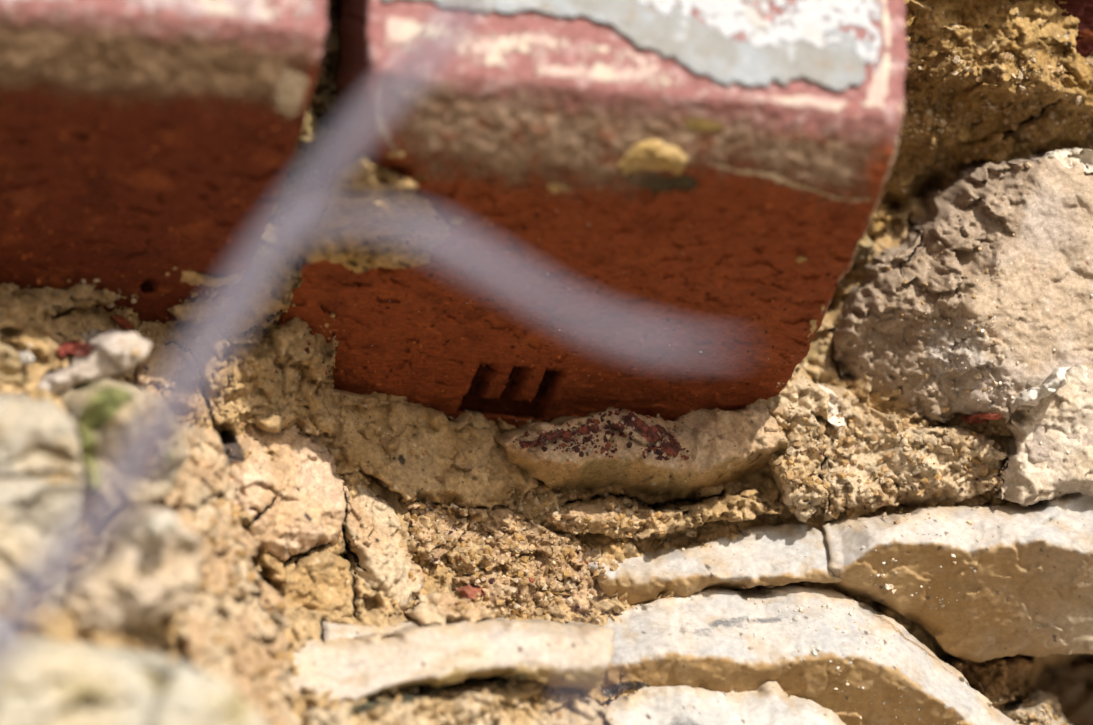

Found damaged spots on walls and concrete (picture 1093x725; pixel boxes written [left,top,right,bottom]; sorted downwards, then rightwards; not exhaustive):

spalling [0,18,309,118]
peeling [470,0,882,92]
spalling [378,84,873,202]
peeling [1013,367,1072,407]
crack [243,498,275,531]
crack [283,487,366,618]